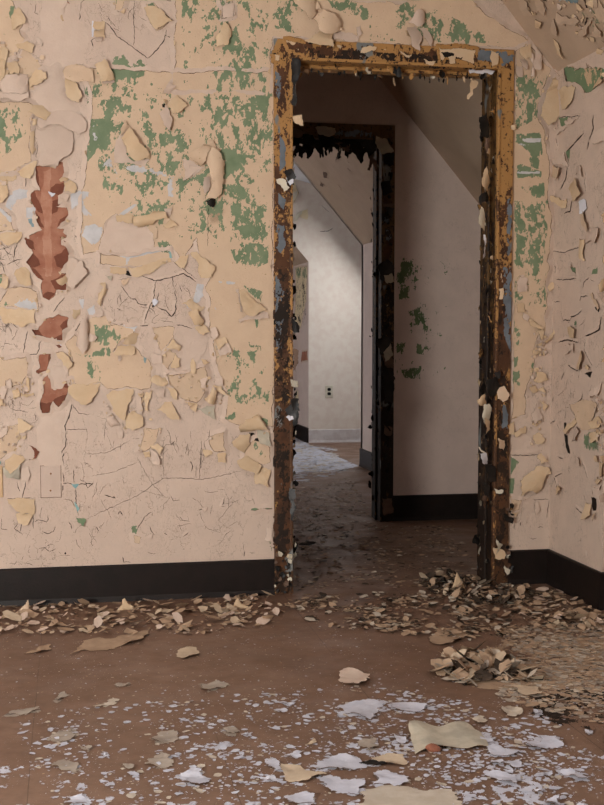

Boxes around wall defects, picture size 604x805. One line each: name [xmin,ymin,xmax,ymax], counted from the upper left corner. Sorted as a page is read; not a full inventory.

crack [79,0,169,58]
crack [556,113,594,214]
crack [0,244,21,275]
crack [0,319,40,355]
crack [109,271,198,329]
peeling [0,0,604,594]
crack [550,245,602,431]
crack [1,403,255,565]